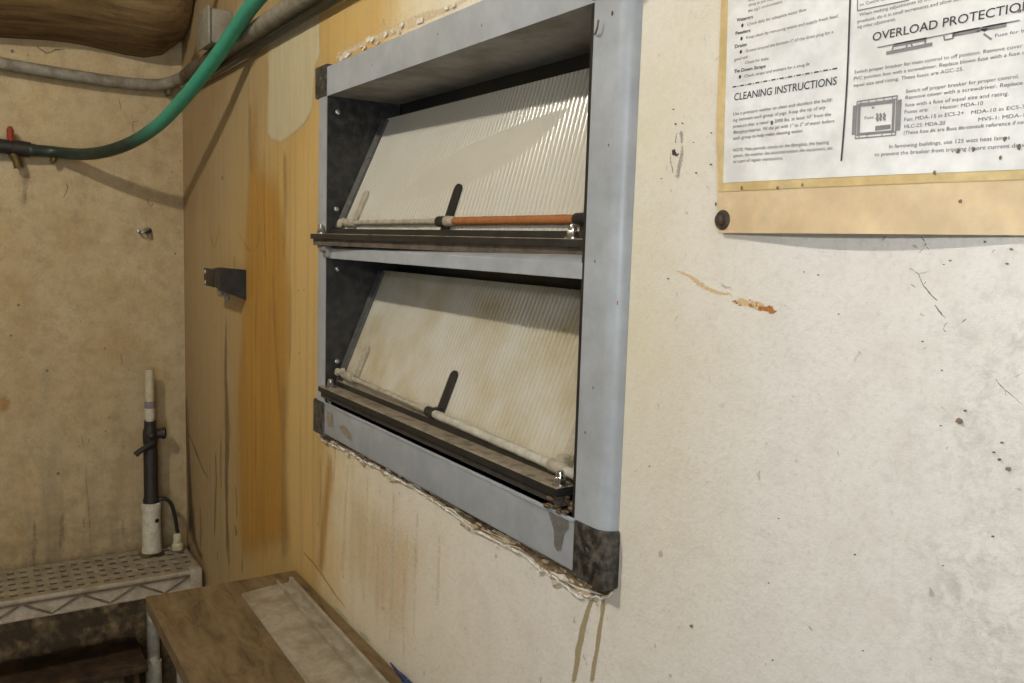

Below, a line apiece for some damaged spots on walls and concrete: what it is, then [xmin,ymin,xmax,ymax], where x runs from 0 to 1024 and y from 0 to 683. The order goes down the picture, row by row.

peeling [335,0,466,62]
leakage [185,81,298,574]
rust [678,271,777,314]
spalling [318,434,613,606]
leakage [572,599,605,683]